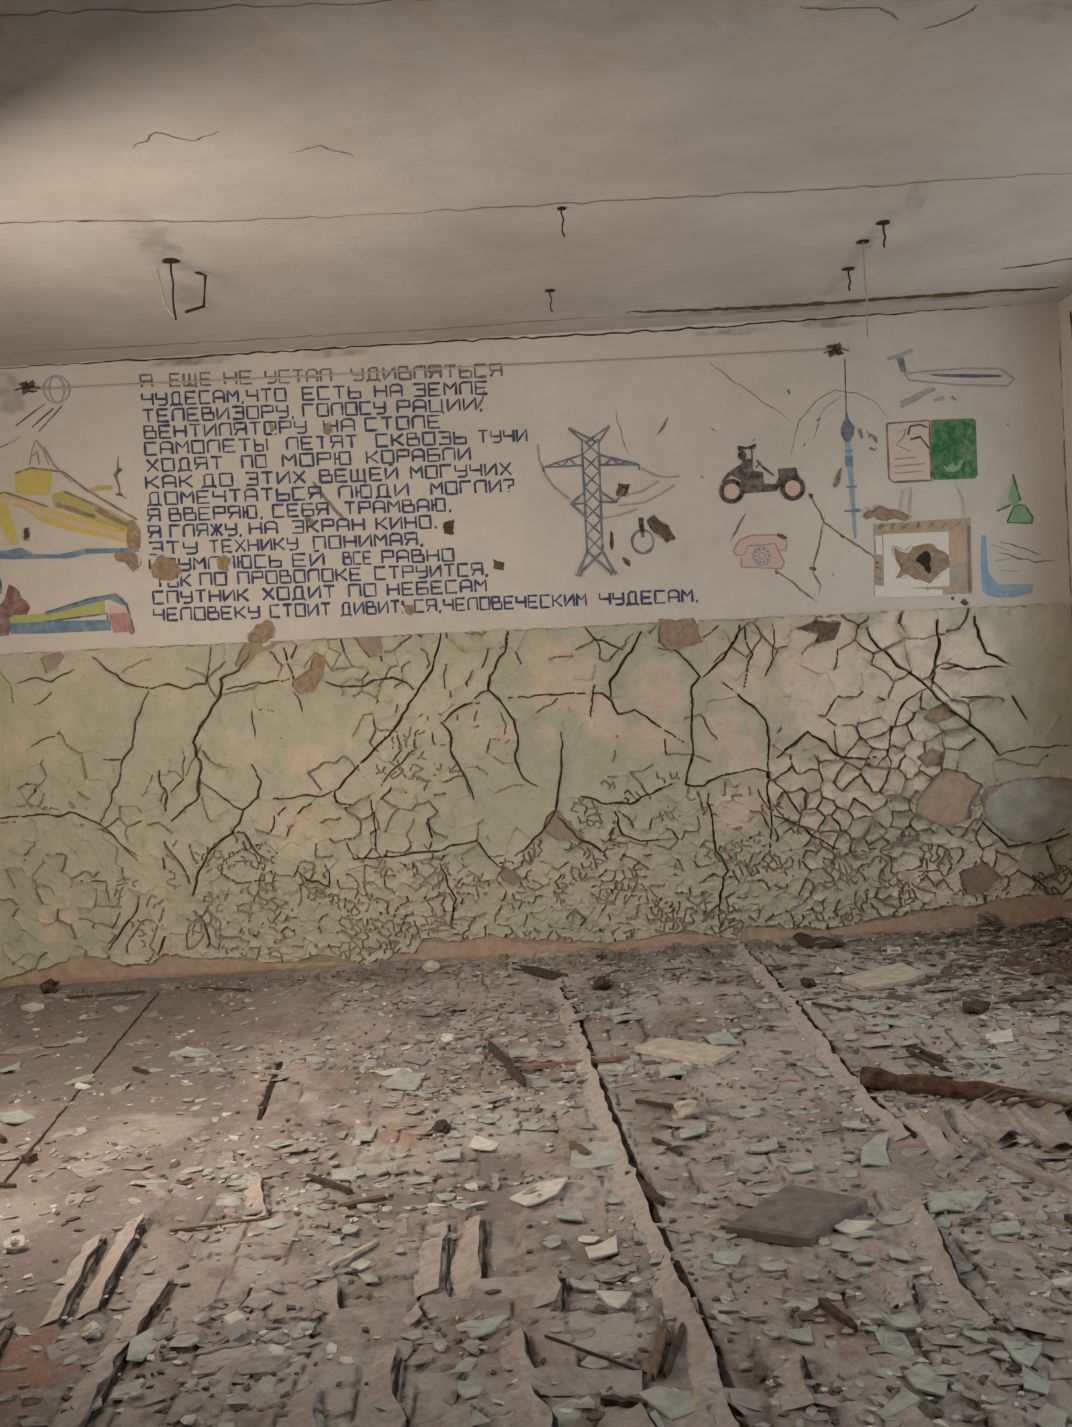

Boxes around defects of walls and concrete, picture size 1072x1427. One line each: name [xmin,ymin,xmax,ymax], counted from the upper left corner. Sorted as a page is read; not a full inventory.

flaking render [644,515,676,546]
flaking render [876,543,951,591]
crack [0,621,1068,947]
flaking render [0,597,1072,1207]
crack [4,992,159,1183]
crack [257,1061,283,1119]
crack [745,945,917,1136]
peeling [39,1213,146,1327]
peeling [51,1276,174,1427]
peeling [318,985,744,1427]
crack [560,987,748,1427]
peeling [831,1191,1052,1396]